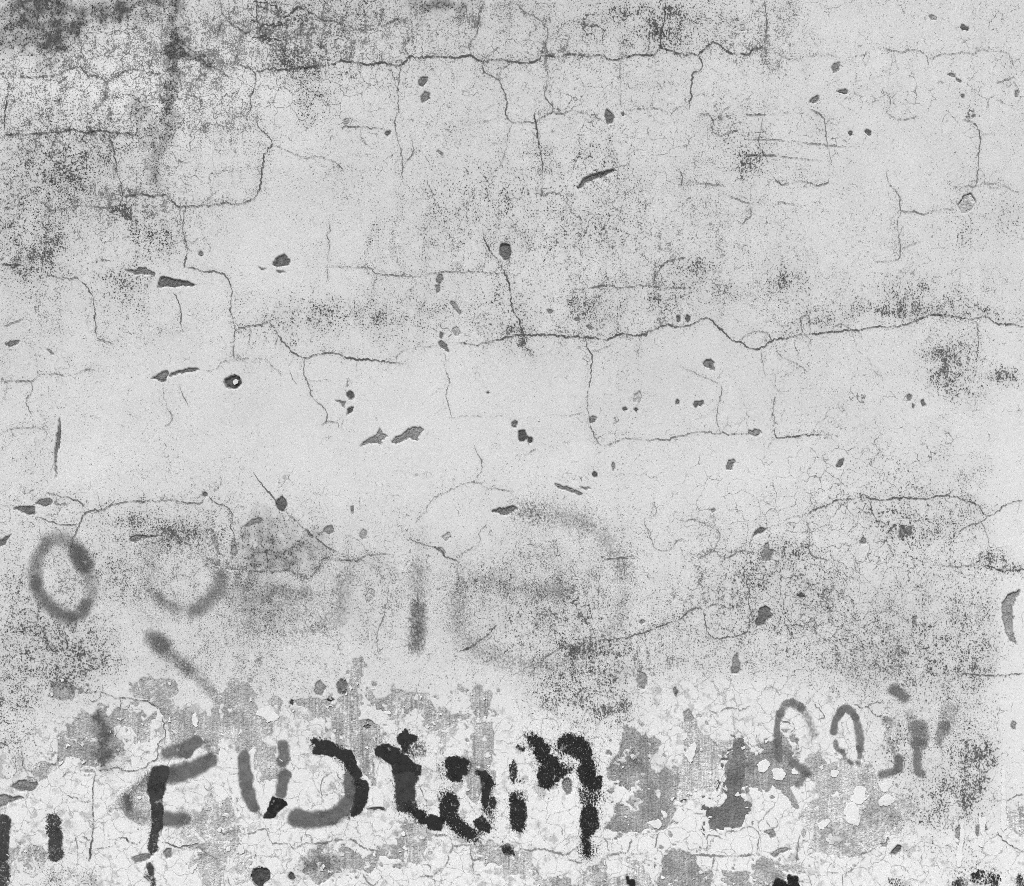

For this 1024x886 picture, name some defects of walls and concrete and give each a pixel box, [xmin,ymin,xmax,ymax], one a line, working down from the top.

crack [0,0,1023,446]
spalling [129,268,194,287]
spalling [363,427,423,445]
crack [40,481,387,578]
crack [793,488,1023,571]
peeling [0,657,500,807]
peeling [133,782,270,886]
crack [22,691,382,885]
peeling [289,819,434,885]
crack [519,829,659,873]
peeling [471,710,920,886]
crack [694,806,892,885]